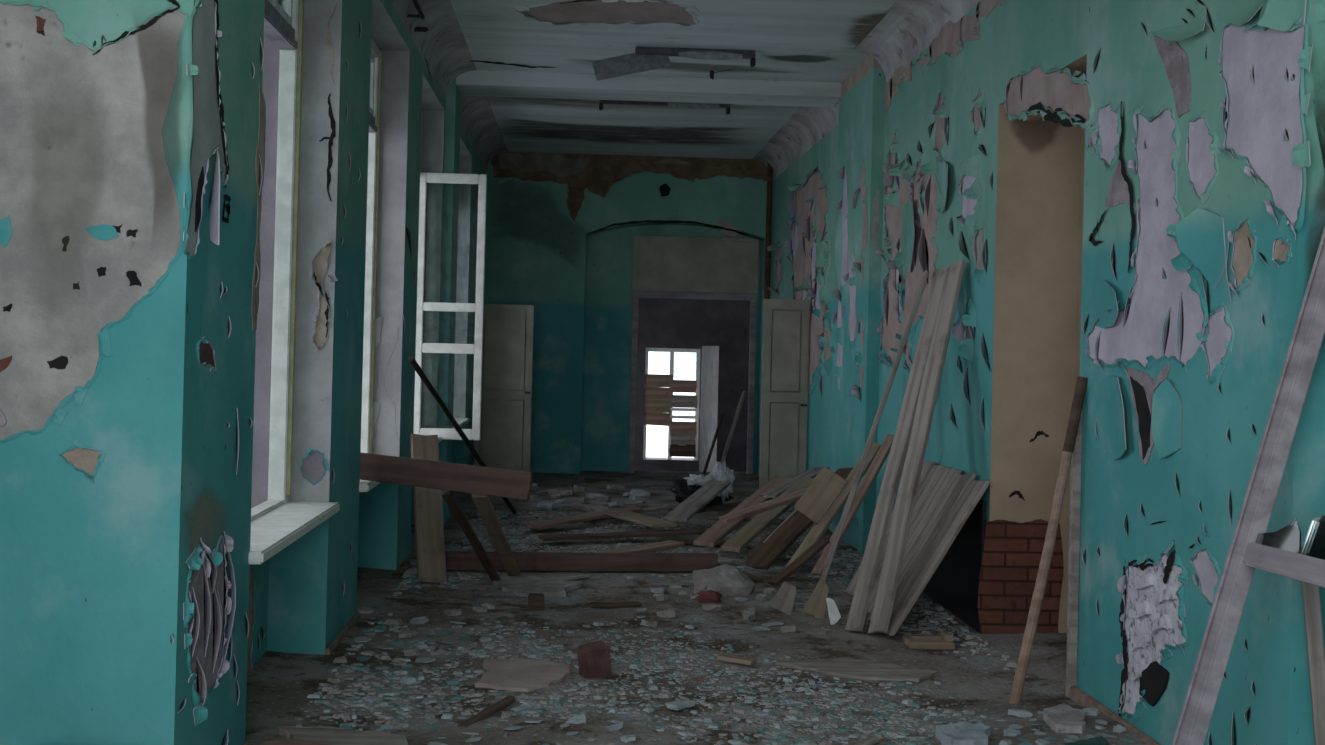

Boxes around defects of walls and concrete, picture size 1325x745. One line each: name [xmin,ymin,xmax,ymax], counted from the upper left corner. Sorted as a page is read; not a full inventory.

crack [93,0,180,55]
flaking render [512,0,700,26]
peeling [883,0,1005,113]
flaking render [0,0,229,443]
crack [319,94,336,201]
flaking render [309,234,348,352]
flaking render [490,152,767,225]
flaking render [767,86,993,430]
flaking render [1004,0,1313,465]
flaking render [170,532,265,726]
flaking render [977,500,1221,745]
peeling [1231,680,1255,745]